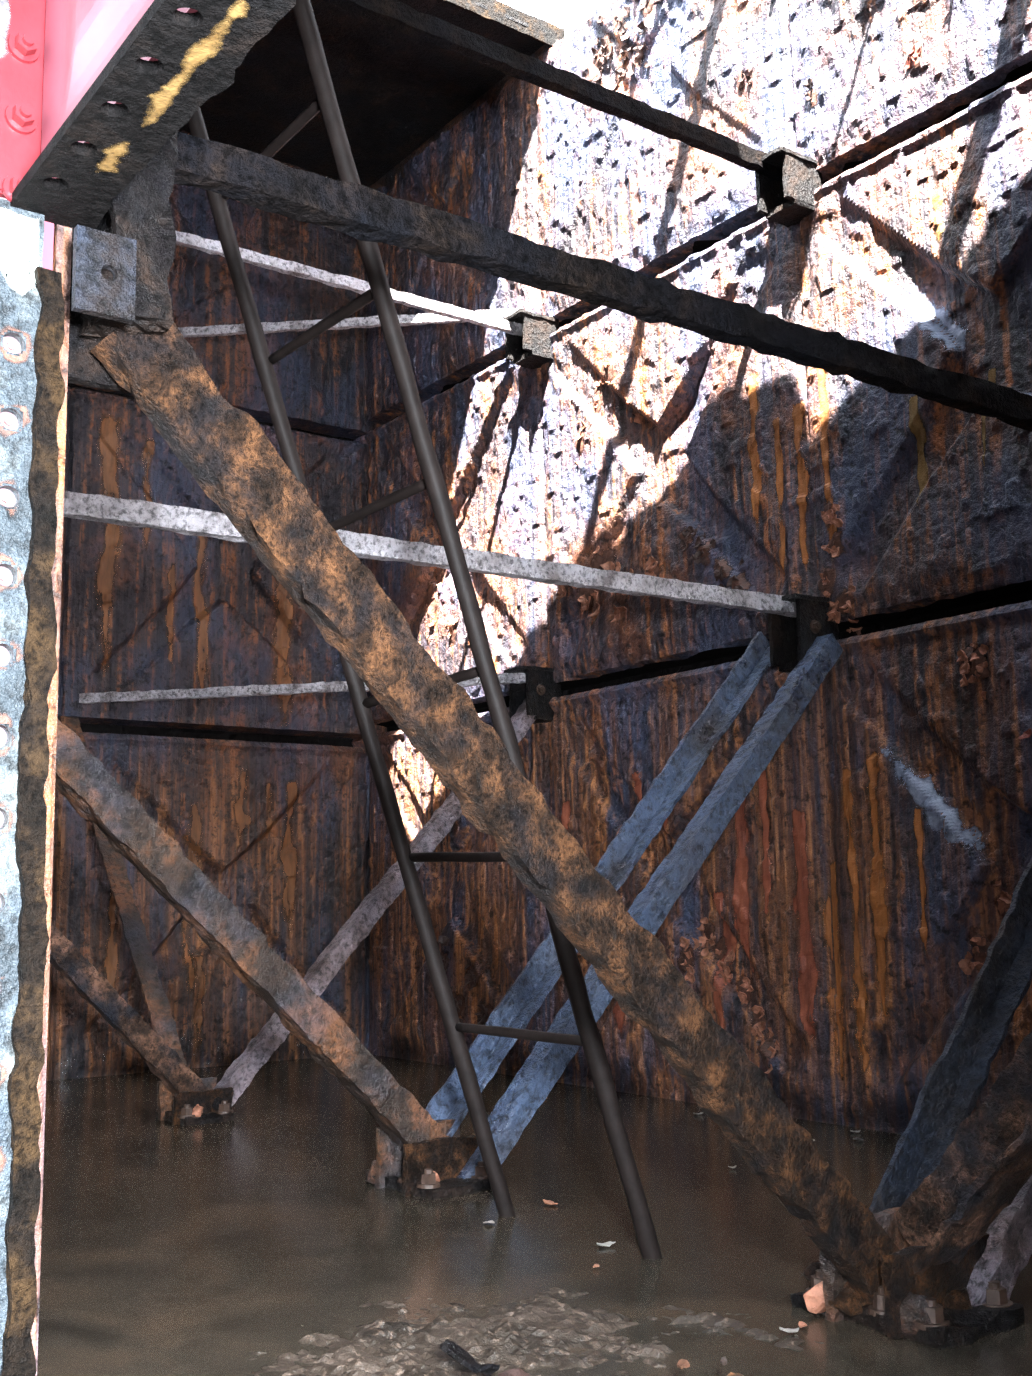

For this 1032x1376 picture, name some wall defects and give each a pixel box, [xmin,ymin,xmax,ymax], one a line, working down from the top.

peeling [0,0,11,58]
peeling [0,208,39,295]
rust [99,415,120,498]
rust [96,523,122,669]
rust [193,536,210,689]
rust [272,582,294,722]
rust [556,585,629,622]
rust [591,545,661,577]
rust [956,642,991,700]
damp [881,749,984,850]
rust [792,751,889,1079]
rust [913,808,928,956]